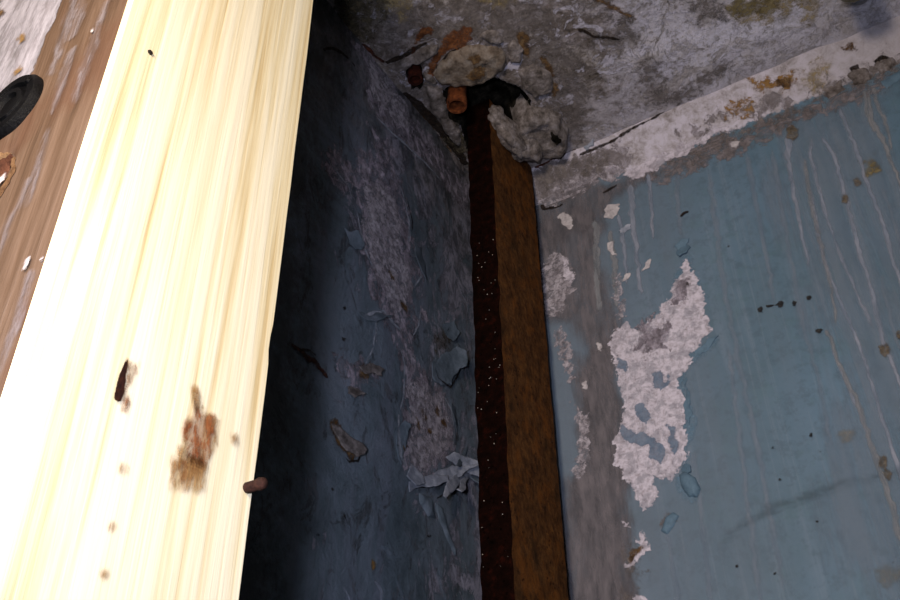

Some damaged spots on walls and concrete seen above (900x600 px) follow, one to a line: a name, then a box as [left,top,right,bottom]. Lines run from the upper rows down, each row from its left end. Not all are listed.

spalling [0,153,13,177]
peeling [0,0,83,92]
rust [171,387,216,489]
leakage [334,0,639,210]
spalling [321,26,813,511]
leakage [536,185,643,600]
leakage [688,0,823,28]
leakage [632,57,900,281]
leakage [804,138,900,540]
peeling [815,53,900,100]